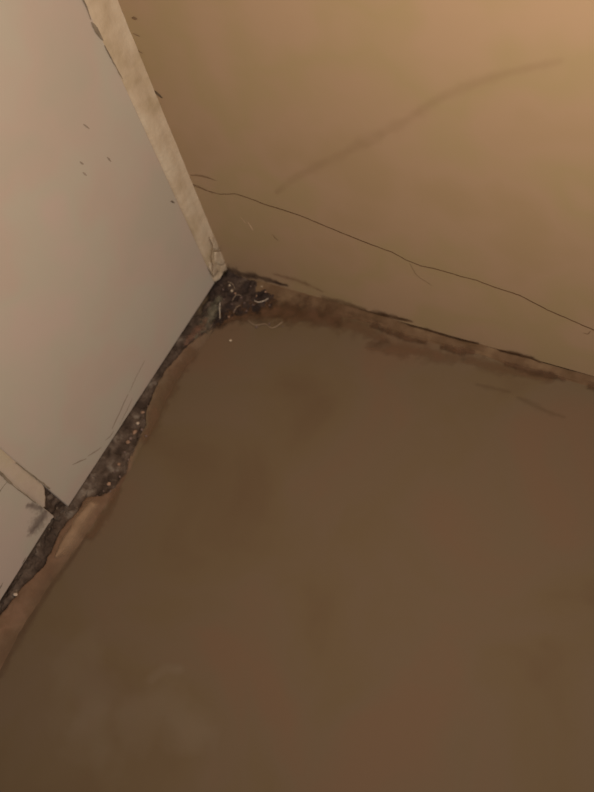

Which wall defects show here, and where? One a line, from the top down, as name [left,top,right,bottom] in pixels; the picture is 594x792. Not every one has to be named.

crack [191,175,594,334]
water stain [23,501,54,542]